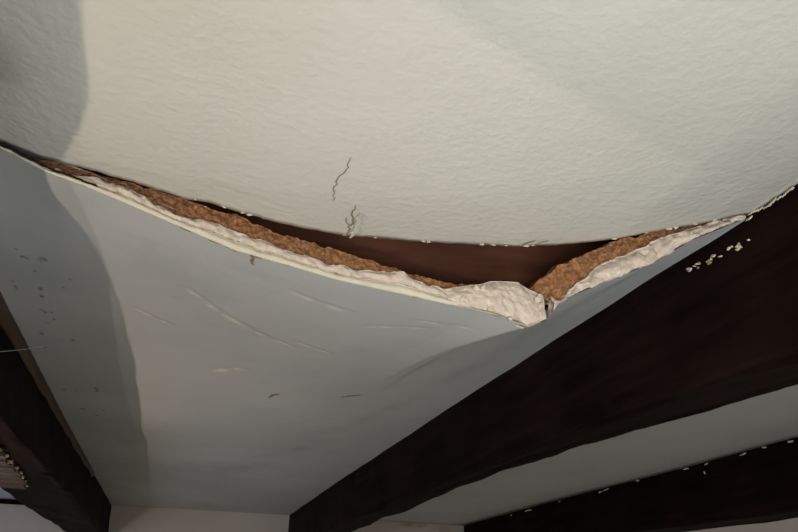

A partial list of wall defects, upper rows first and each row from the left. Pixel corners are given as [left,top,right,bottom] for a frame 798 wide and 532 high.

crack [332,159,350,201]
crack [345,205,362,238]
flaking render [0,146,798,328]